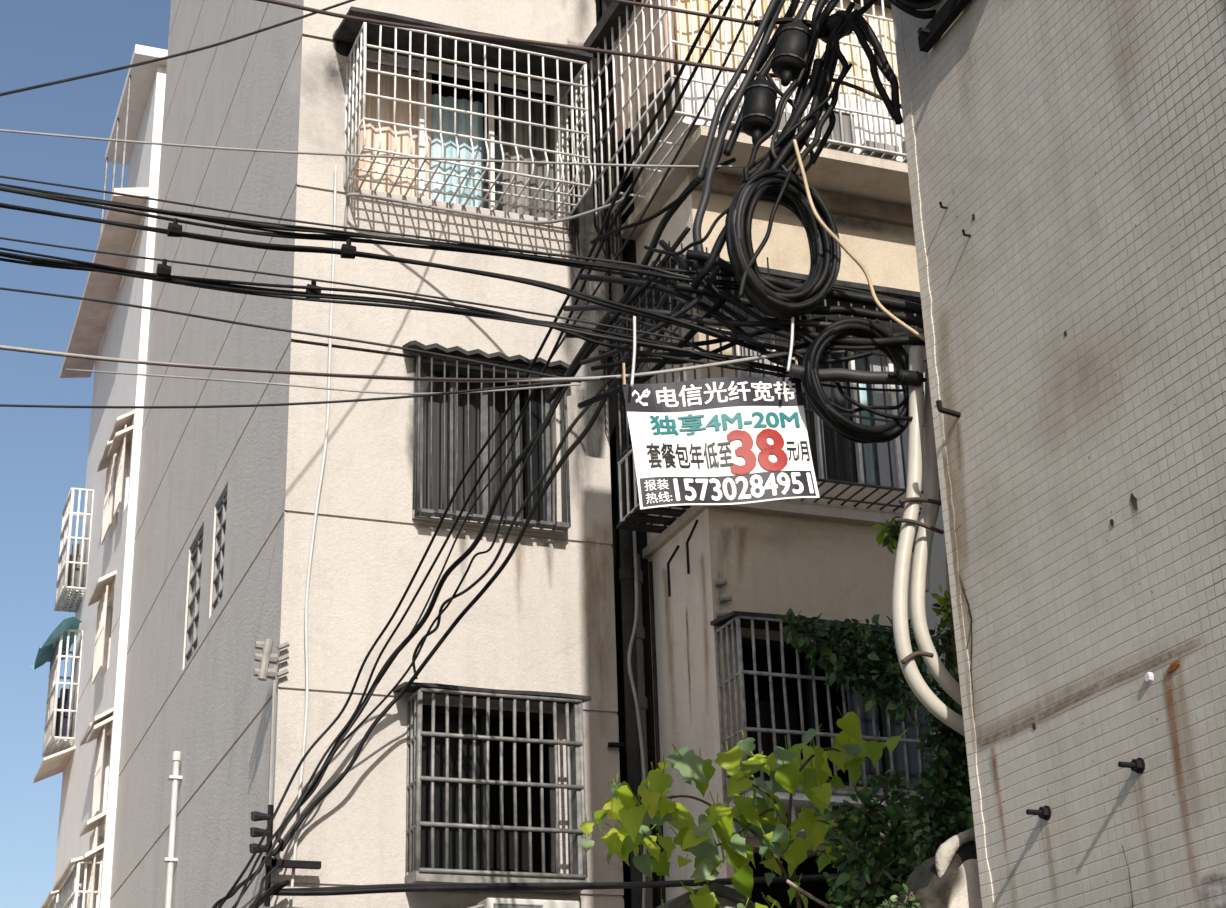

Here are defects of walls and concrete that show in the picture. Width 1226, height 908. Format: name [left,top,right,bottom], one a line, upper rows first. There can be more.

rust [980,642,1195,831]